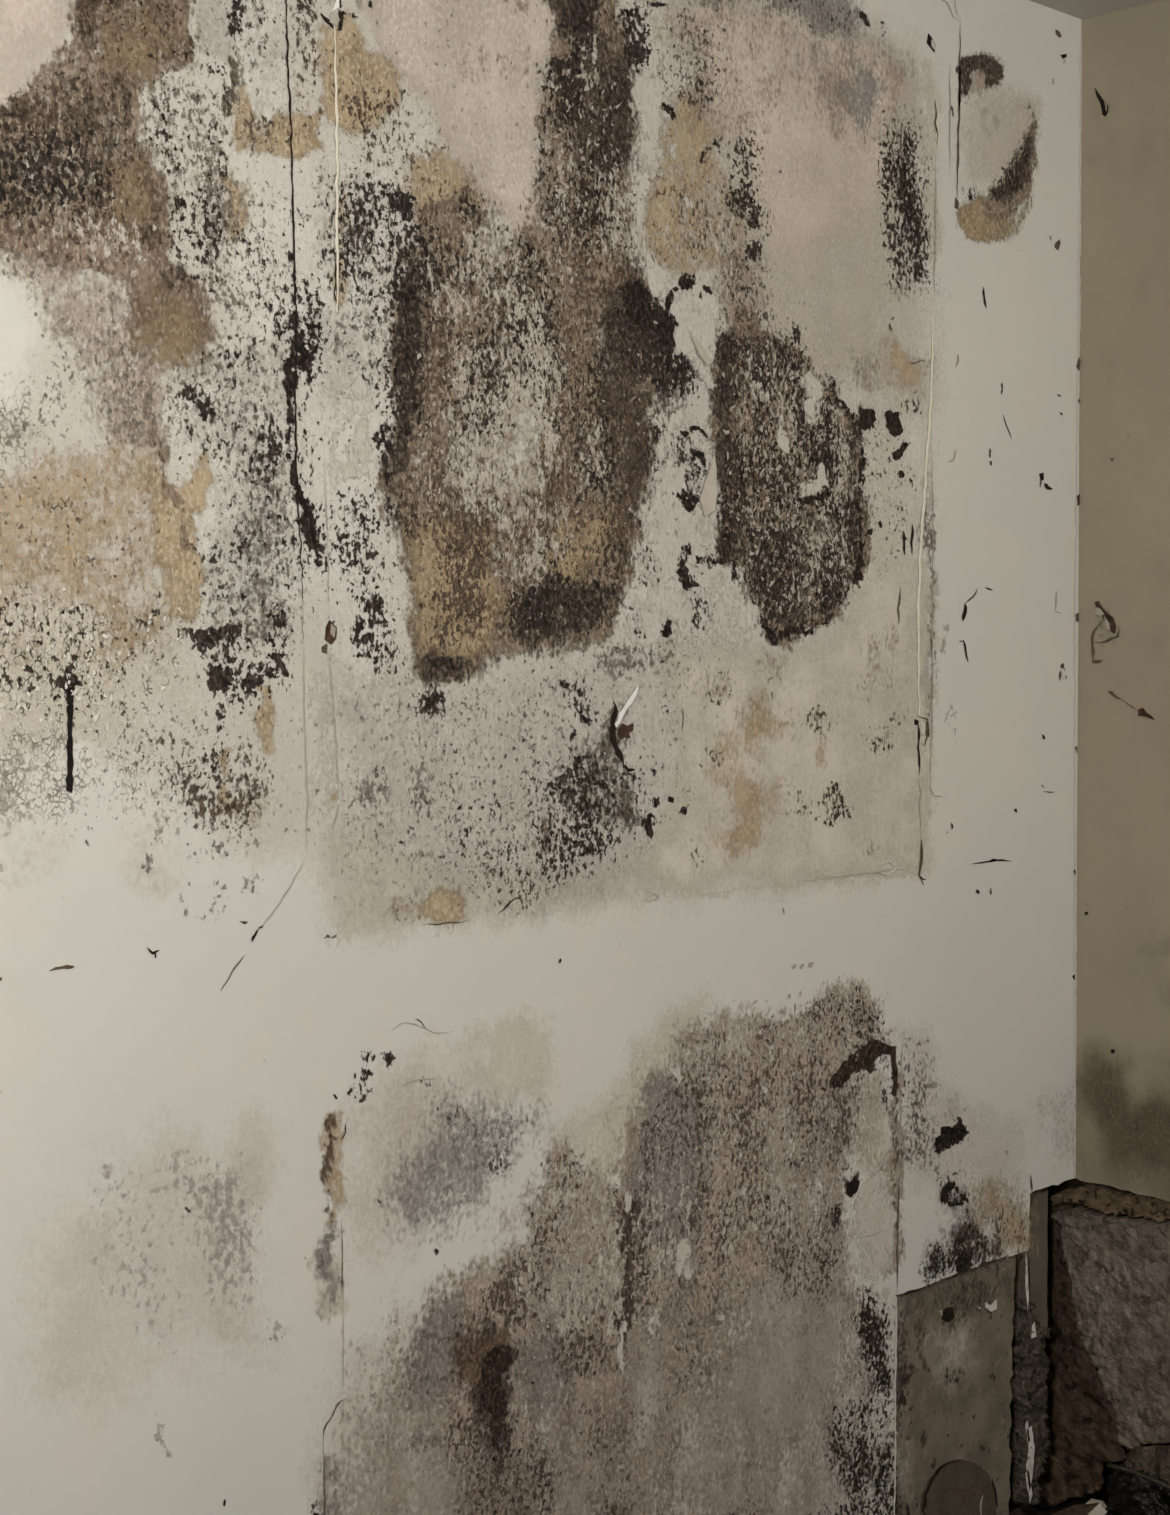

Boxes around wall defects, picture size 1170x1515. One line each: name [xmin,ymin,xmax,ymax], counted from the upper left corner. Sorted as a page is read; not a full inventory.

crack [943,0,961,209]
water stain [956,52,1038,243]
crack [332,253,340,311]
crack [221,0,308,990]
water stain [0,0,938,928]
spalling [1048,1178,1170,1221]
water stain [311,977,1018,1515]
spalling [938,1307,954,1322]
peeling [1025,1251,1037,1339]
peeling [1008,1420,1038,1512]
spalling [1085,1443,1170,1503]